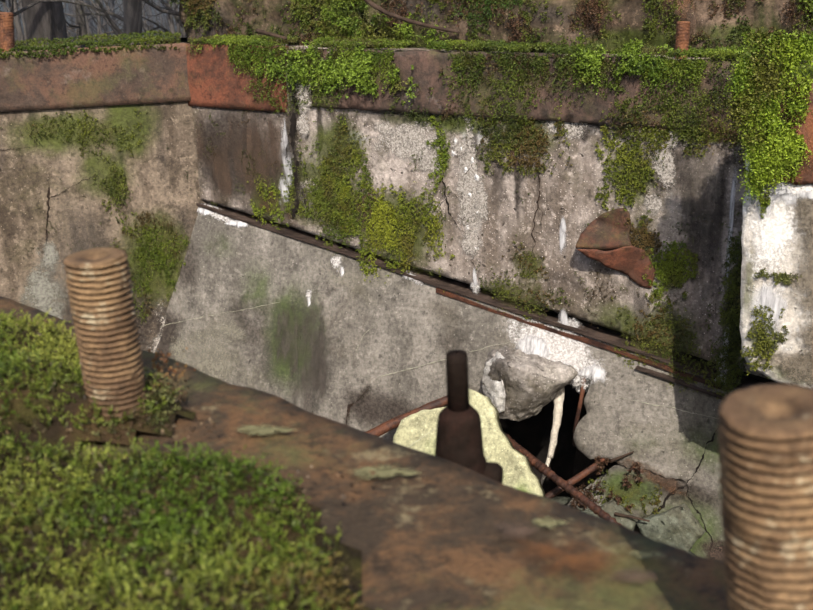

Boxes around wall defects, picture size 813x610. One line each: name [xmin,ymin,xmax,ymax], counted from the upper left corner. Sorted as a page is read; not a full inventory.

crack [46,176,94,244]
crack [283,78,307,217]
damp [746,182,813,384]
rust [545,458,609,507]
spalling [627,460,682,493]
crack [617,397,718,548]